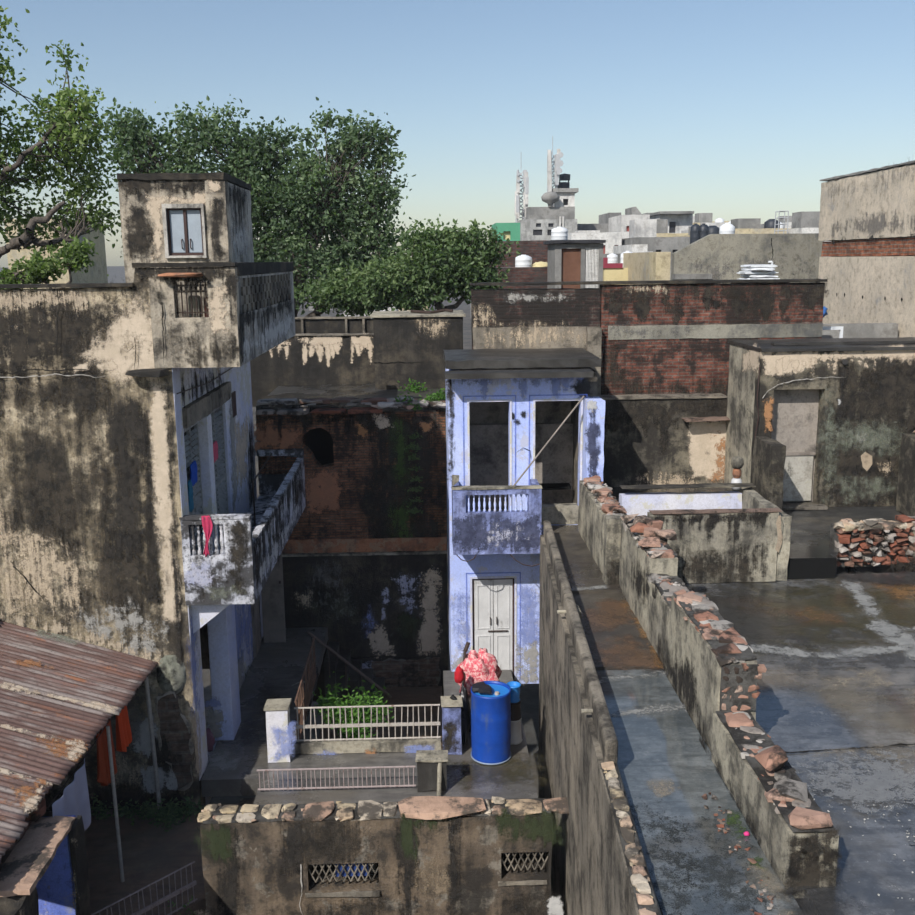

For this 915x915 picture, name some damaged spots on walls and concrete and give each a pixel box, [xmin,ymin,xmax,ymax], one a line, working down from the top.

peeling [243,309,374,368]
damp [0,179,455,665]
damp [584,341,729,477]
peeling [764,397,774,431]
damp [816,357,915,507]
peeling [260,504,299,582]
damp [654,509,915,654]
peeling [362,567,443,676]
rust [0,682,118,713]
rust [0,724,88,763]
rust [0,767,52,808]
damp [500,890,564,915]